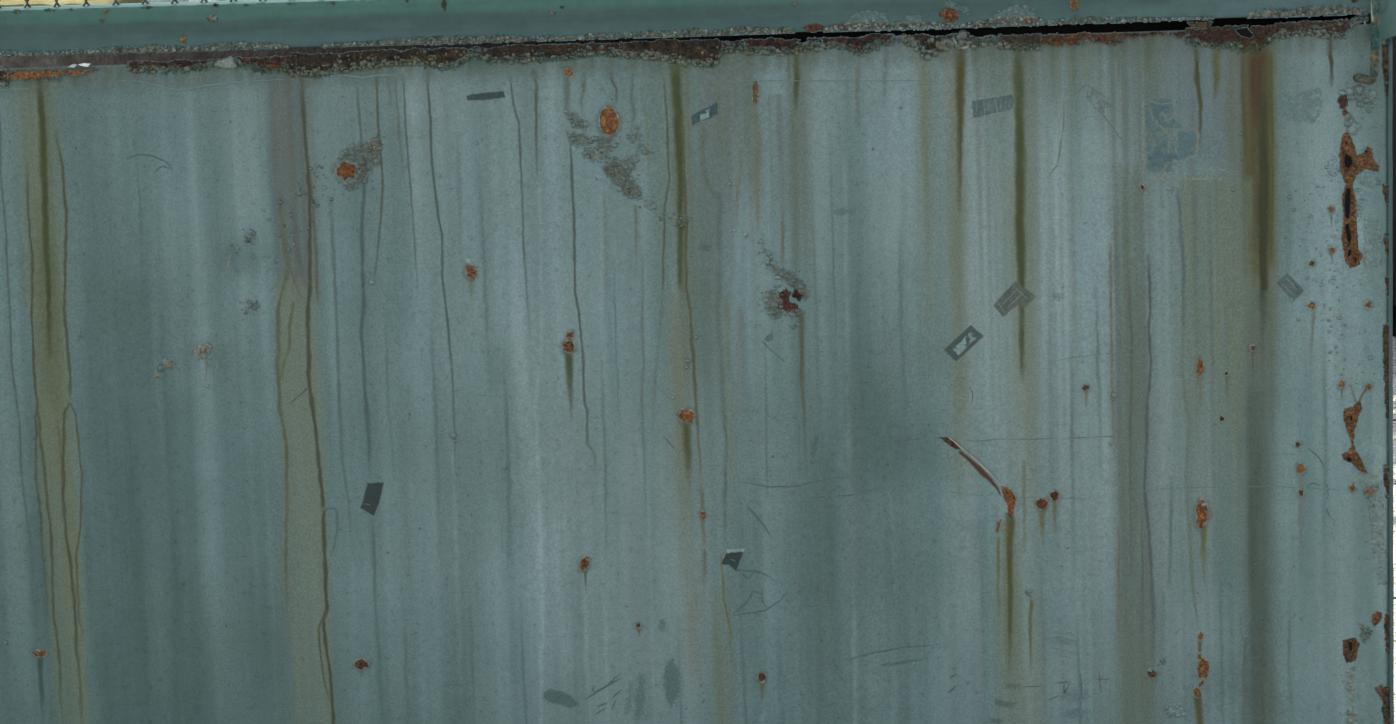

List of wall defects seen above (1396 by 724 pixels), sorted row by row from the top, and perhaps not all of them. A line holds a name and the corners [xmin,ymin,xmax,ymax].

corrosion [0,63,99,89]
corrosion [593,102,624,139]
corrosion [125,0,1369,81]
corrosion [1306,131,1389,271]
corrosion [1361,276,1389,312]
corrosion [557,327,581,425]
corrosion [1335,324,1389,499]
corrosion [1191,631,1211,724]